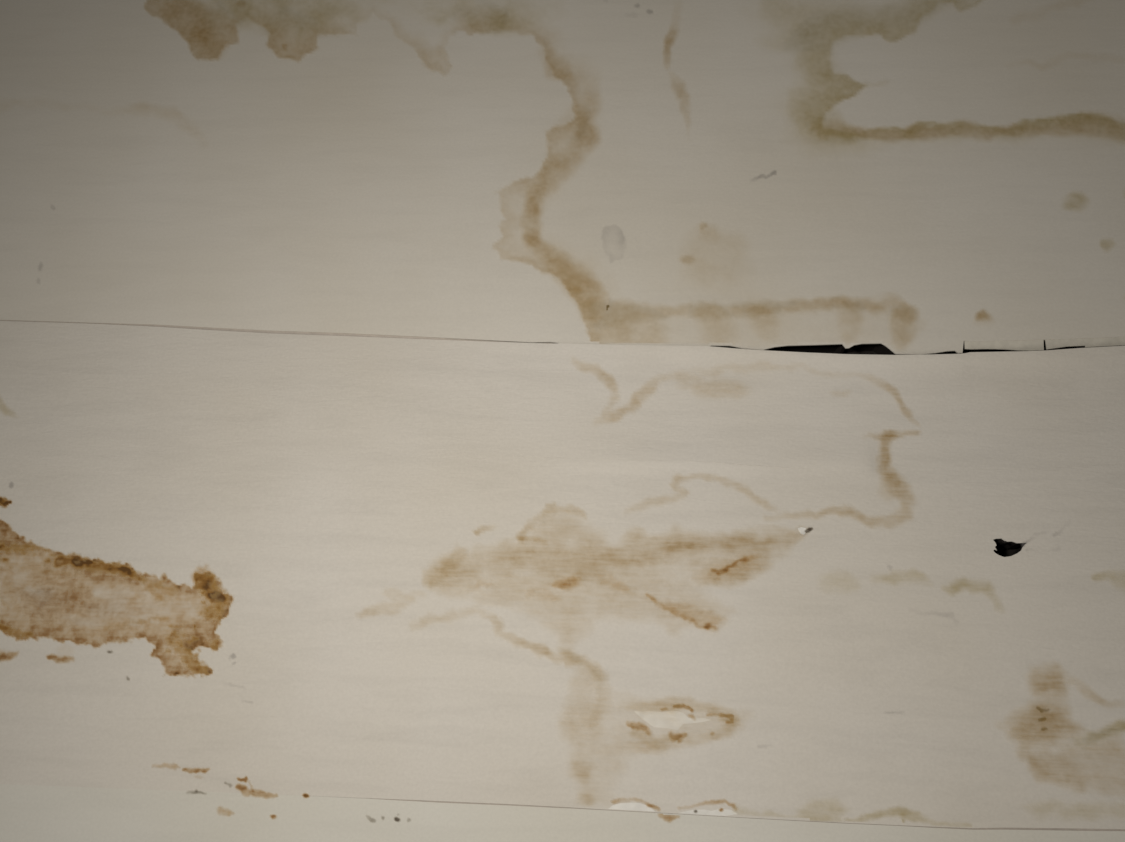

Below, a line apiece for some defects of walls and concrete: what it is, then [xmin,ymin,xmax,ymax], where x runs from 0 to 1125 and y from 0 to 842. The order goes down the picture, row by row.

crack [0,320,555,344]
crack [712,344,895,355]
crack [936,337,1125,354]
water stain [712,557,749,575]